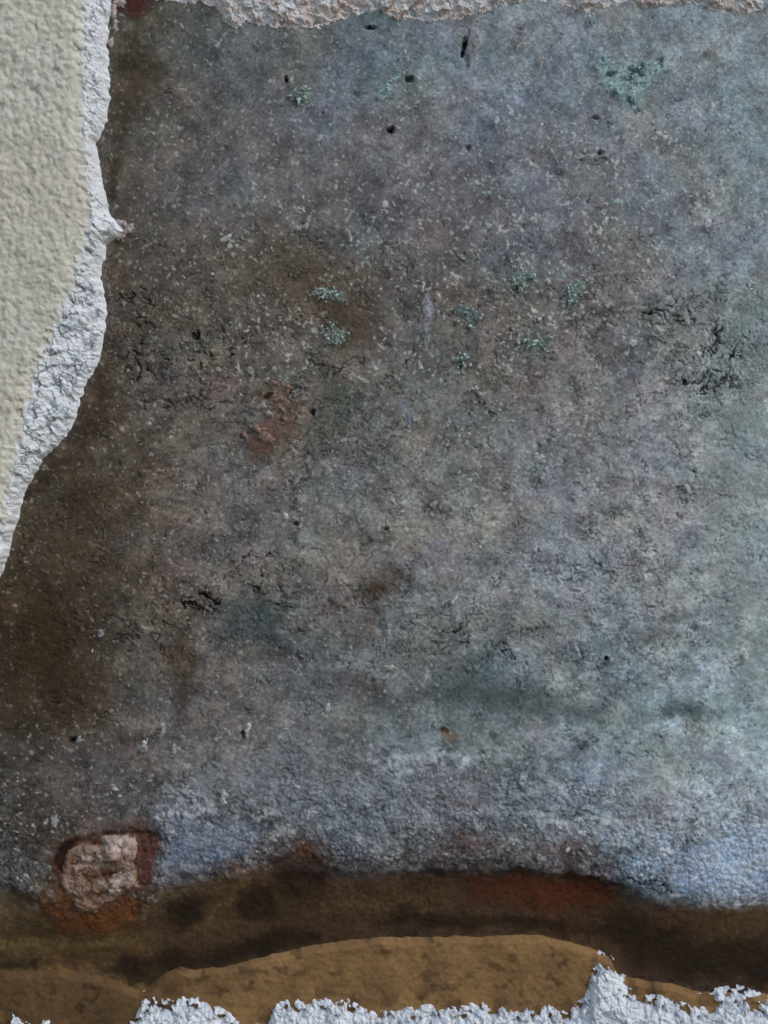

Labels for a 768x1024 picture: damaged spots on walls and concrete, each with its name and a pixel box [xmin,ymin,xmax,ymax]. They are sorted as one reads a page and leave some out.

spalling [1,0,135,547]
crack [641,303,748,396]
rust [43,818,161,934]
peeling [73,838,141,894]
damp [0,837,768,986]
spalling [11,1012,50,1024]
spalling [129,990,239,1024]
spalling [268,950,768,1024]